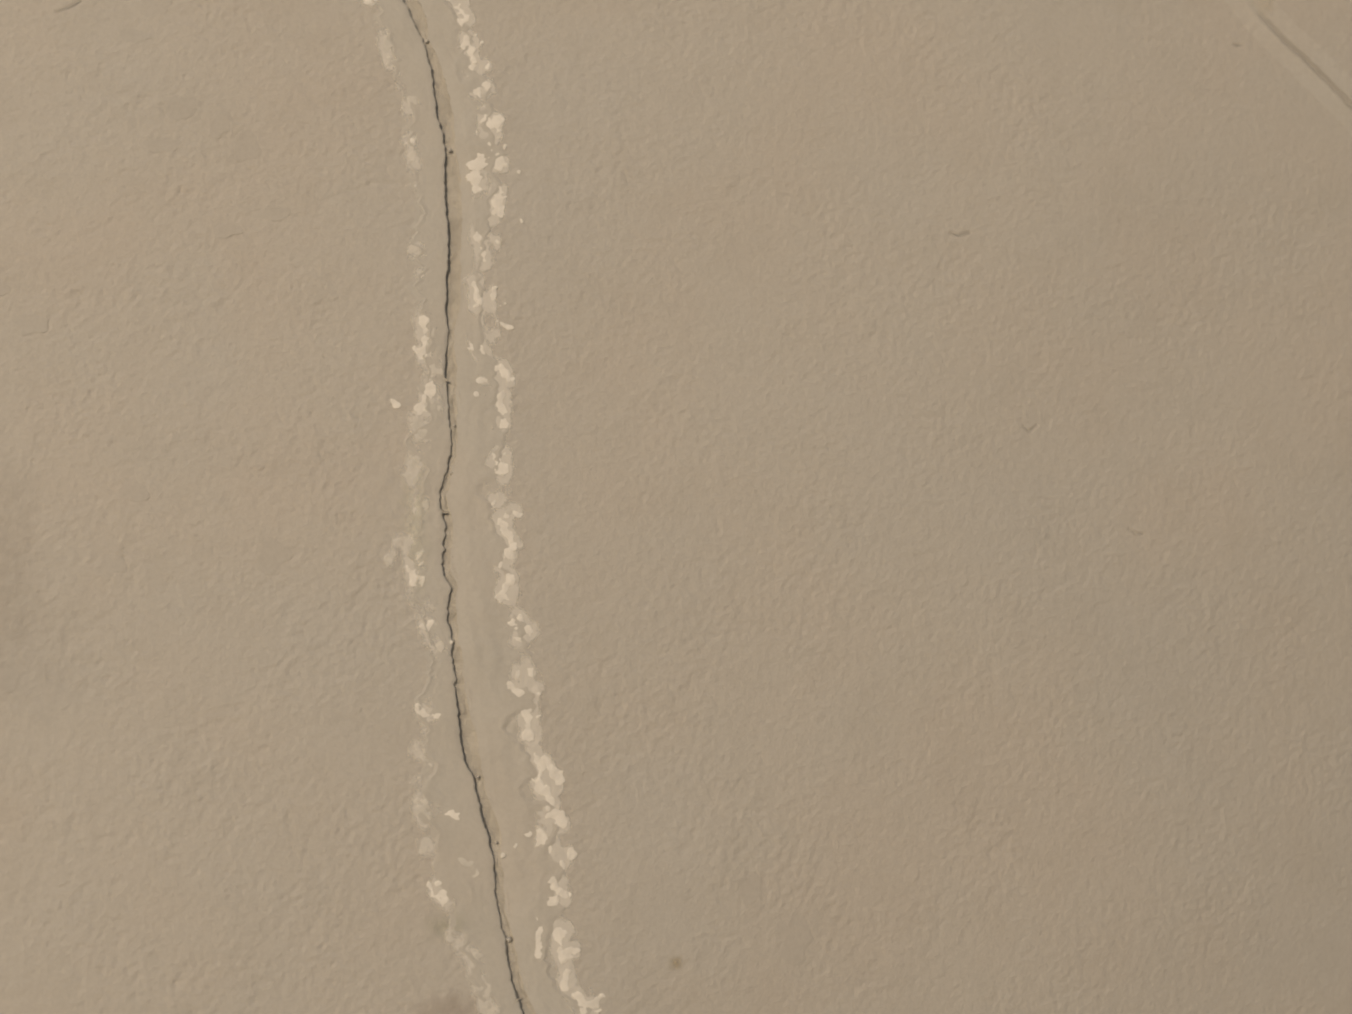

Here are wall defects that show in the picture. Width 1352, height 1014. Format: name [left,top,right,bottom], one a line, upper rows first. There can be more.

crack [403,0,536,1014]